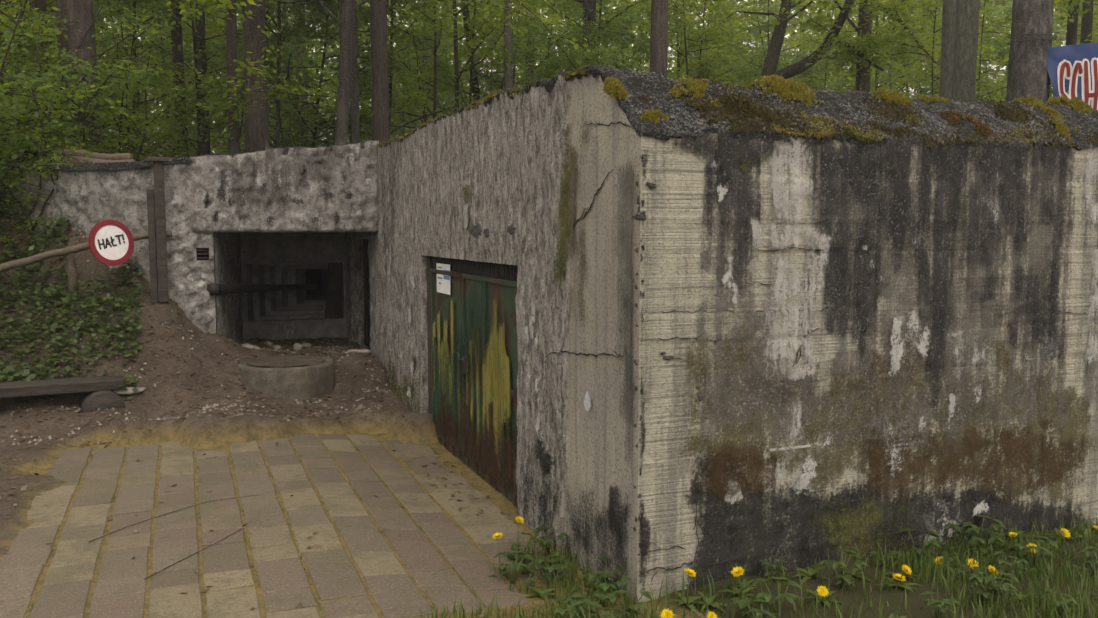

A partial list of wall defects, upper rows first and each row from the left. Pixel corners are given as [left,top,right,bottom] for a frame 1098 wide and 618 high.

water stain [559,124,575,314]
crack [569,171,612,231]
crack [548,281,860,382]
crack [758,244,822,252]
water stain [673,131,1075,428]
water stain [516,438,651,596]
water stain [686,401,1087,589]